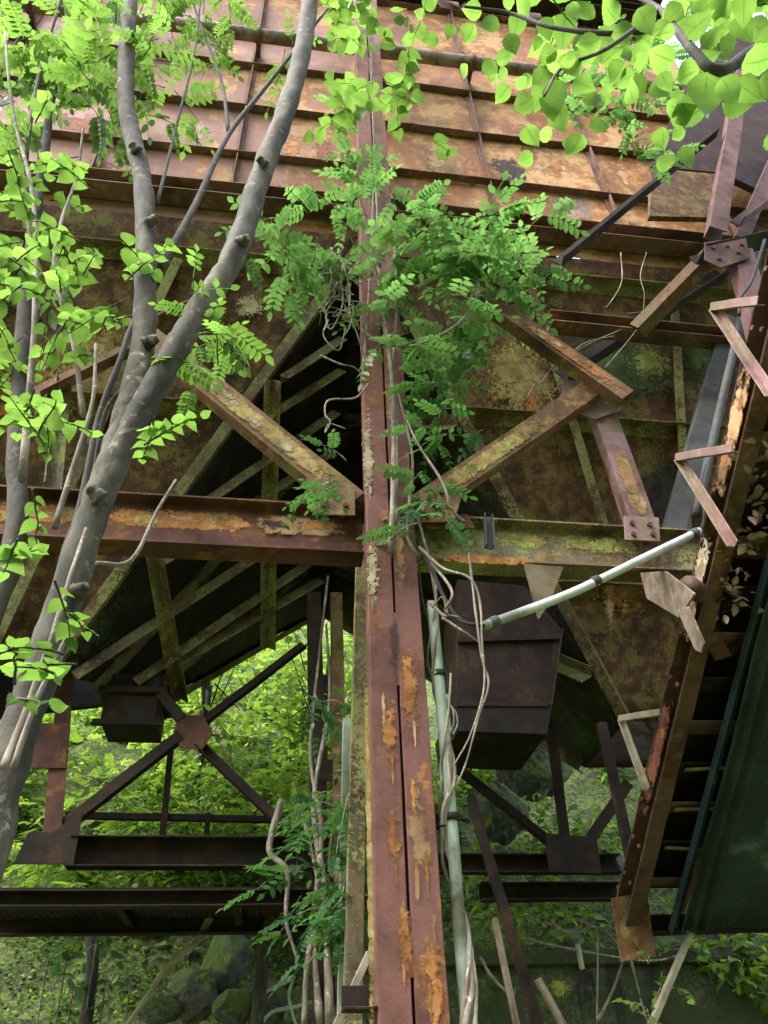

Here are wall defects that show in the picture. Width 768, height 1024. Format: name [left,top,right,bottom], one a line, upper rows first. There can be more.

corrosion [409,114,469,140]
corrosion [420,124,583,220]
corrosion [203,321,238,391]
corrosion [716,369,750,494]
corrosion [29,504,76,525]
corrosion [109,506,344,537]
corrosion [615,446,648,517]
corrosion [434,554,537,565]
corrosion [593,581,654,639]
corrosion [641,707,669,814]
corrosion [364,623,422,1024]
corrosion [385,779,444,1024]